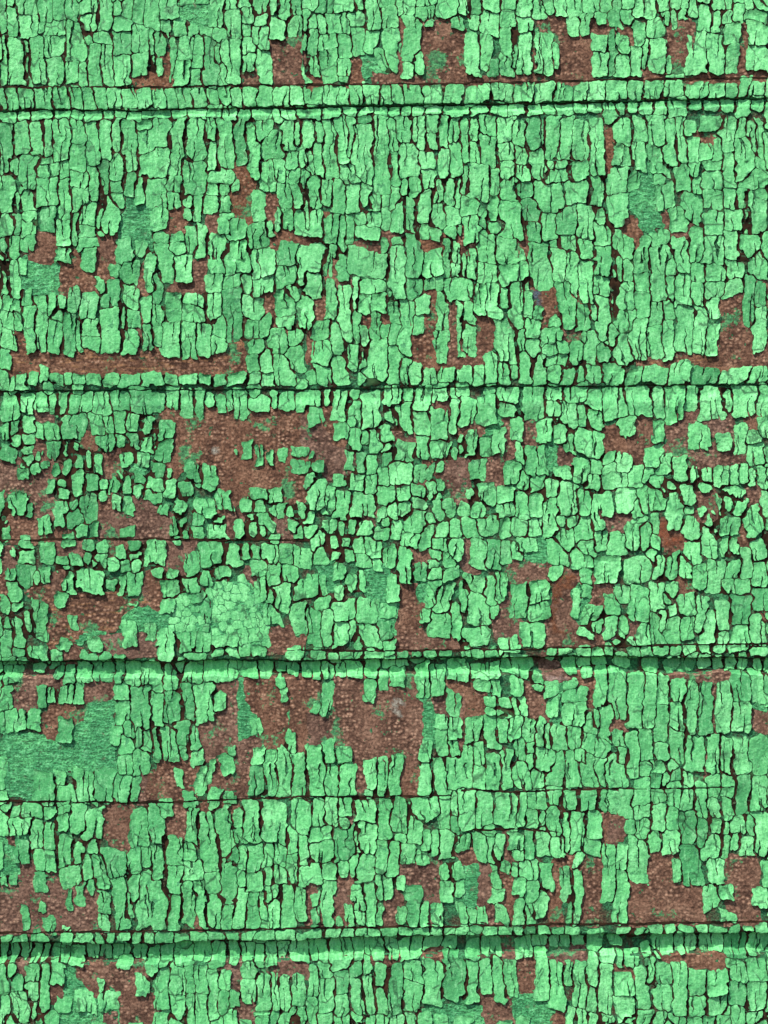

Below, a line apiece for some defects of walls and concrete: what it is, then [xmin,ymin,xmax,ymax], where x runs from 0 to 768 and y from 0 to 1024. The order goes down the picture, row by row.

crack [0,0,768,452]
peeling [0,0,768,661]
crack [0,251,768,1024]
peeling [0,391,768,1024]